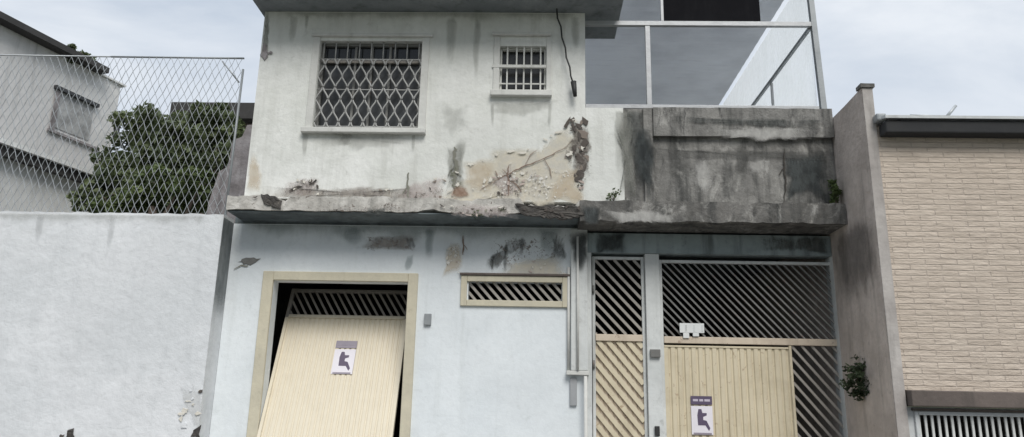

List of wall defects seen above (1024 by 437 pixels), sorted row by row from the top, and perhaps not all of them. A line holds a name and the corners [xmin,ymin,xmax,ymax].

peeling [235,257,259,269]
spalling [253,179,319,209]
peeling [378,117,591,221]
damp [460,176,669,277]
damp [618,112,653,191]
damp [695,118,824,198]
crack [778,149,786,202]
peeling [178,390,203,437]